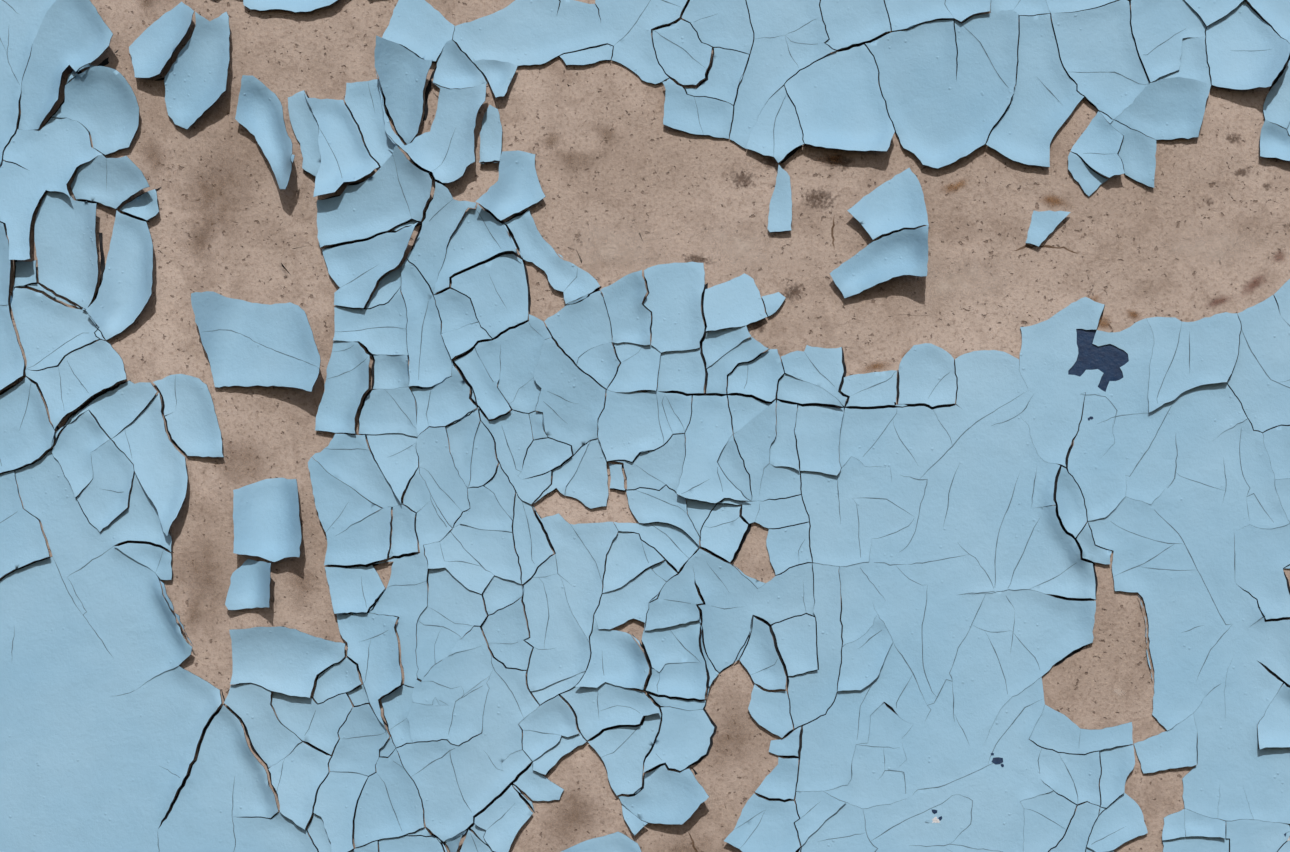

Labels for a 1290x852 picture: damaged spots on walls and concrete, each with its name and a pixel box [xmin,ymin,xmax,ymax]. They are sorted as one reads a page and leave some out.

crack [0,0,161,301]
crack [399,40,489,121]
crack [565,0,1290,180]
crack [0,333,189,657]
peeling [0,0,893,852]
crack [158,84,1290,852]
peeling [290,0,1290,705]
peeling [1020,467,1290,852]